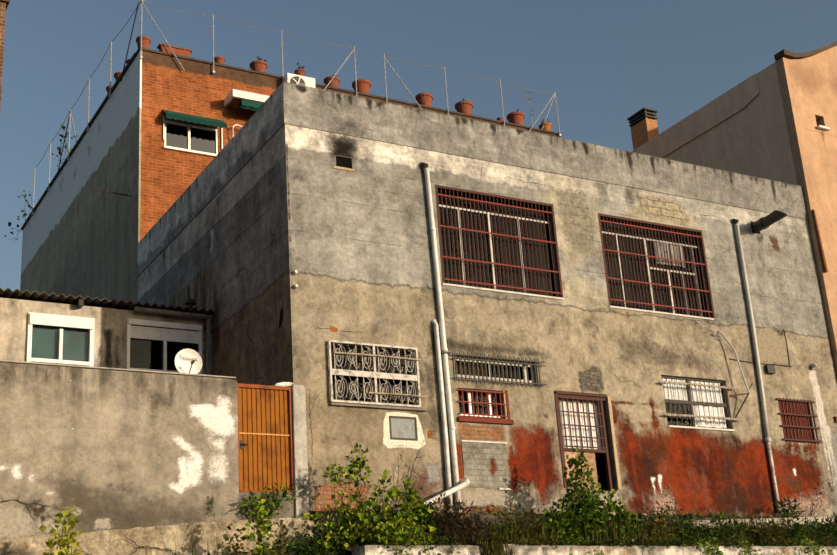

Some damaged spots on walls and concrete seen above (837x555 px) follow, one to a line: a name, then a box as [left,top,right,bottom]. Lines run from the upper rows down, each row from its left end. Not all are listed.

spalling [578,366,604,393]
efflorescence [809,370,837,486]
peeling [456,423,562,513]
crack [0,495,58,521]
flaking render [314,481,370,513]